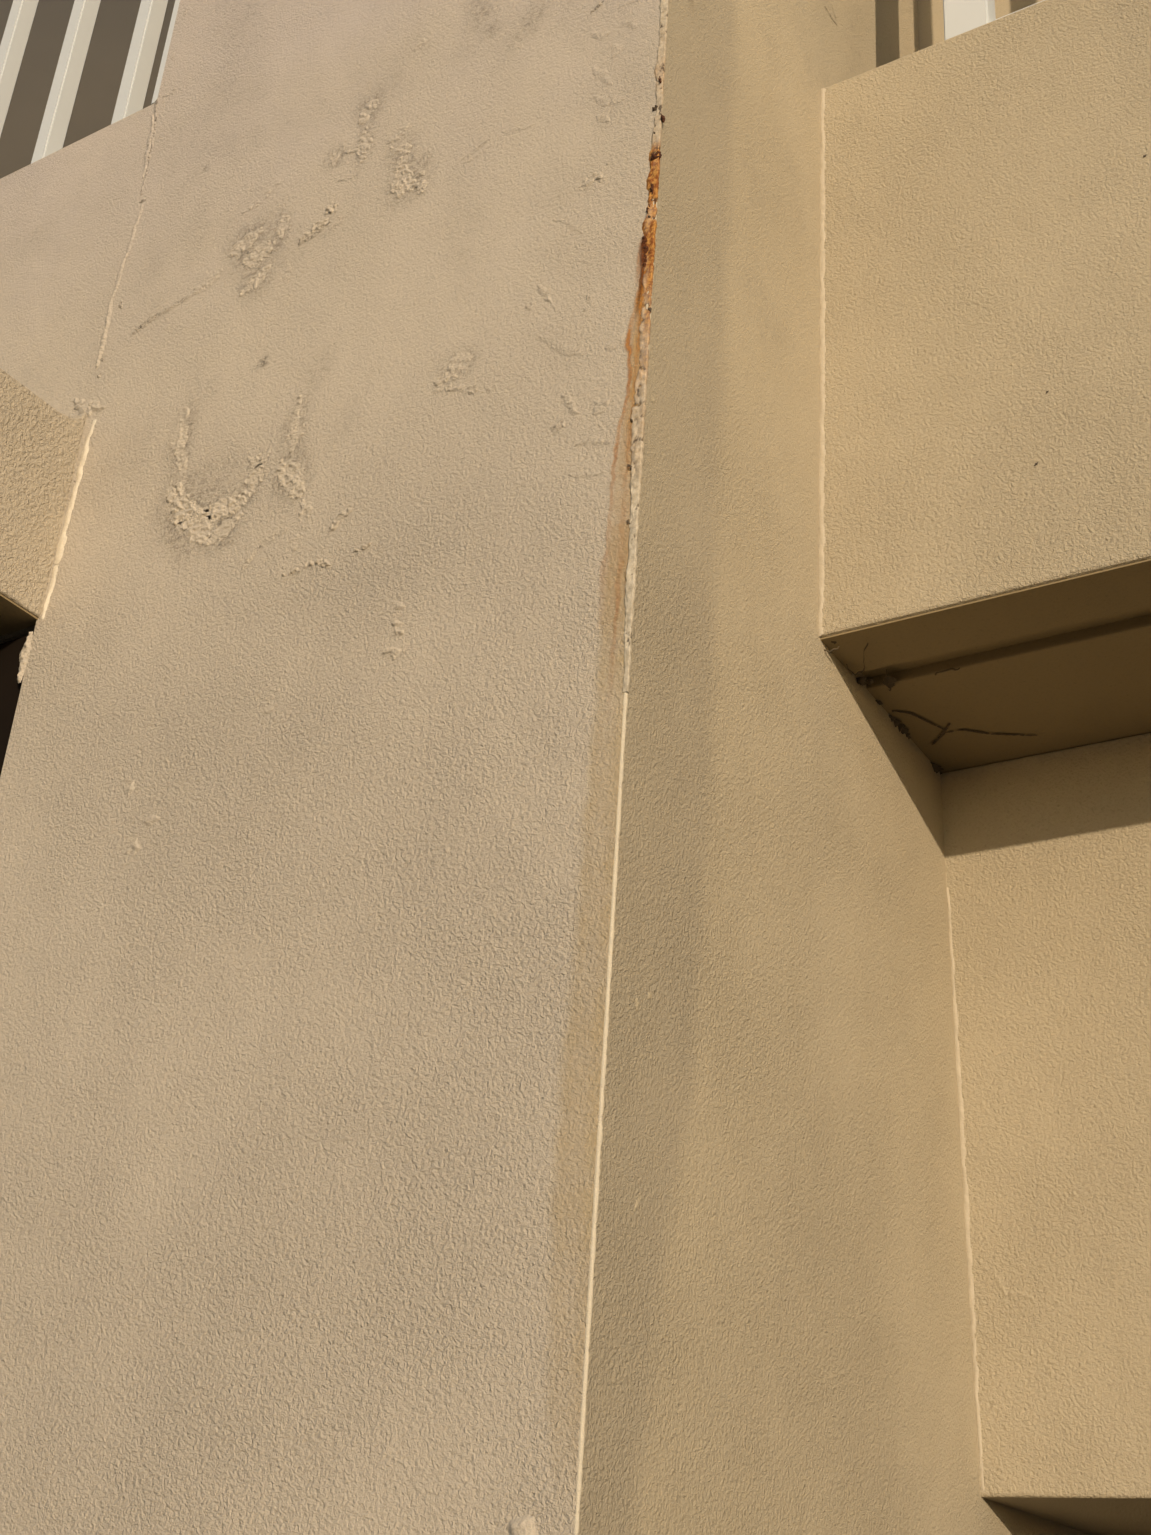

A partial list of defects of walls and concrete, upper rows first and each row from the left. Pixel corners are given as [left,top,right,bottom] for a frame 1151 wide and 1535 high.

peeling [385,122,434,200]
peeling [227,201,349,297]
corrosion [626,239,646,403]
peeling [164,395,313,551]
crack [892,710,1037,745]